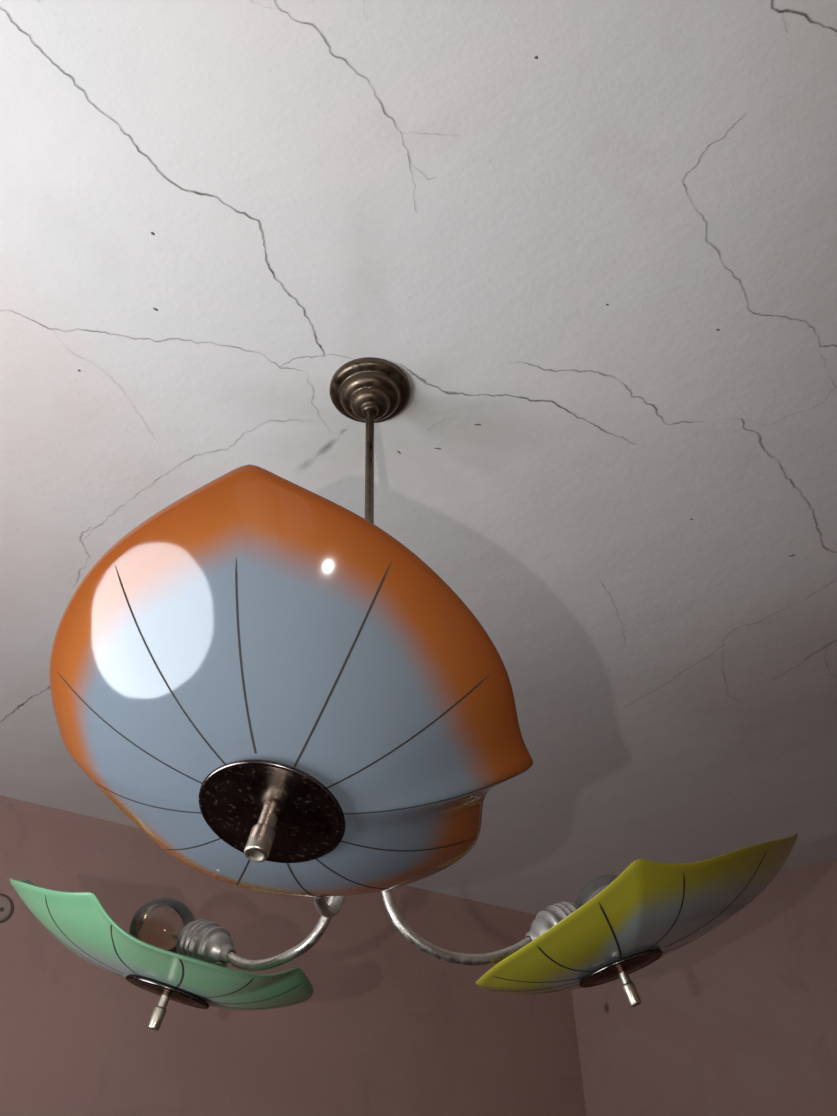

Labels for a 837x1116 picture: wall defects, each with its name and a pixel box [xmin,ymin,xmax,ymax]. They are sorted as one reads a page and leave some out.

crack [771,0,837,32]
crack [10,20,97,109]
crack [123,133,324,354]